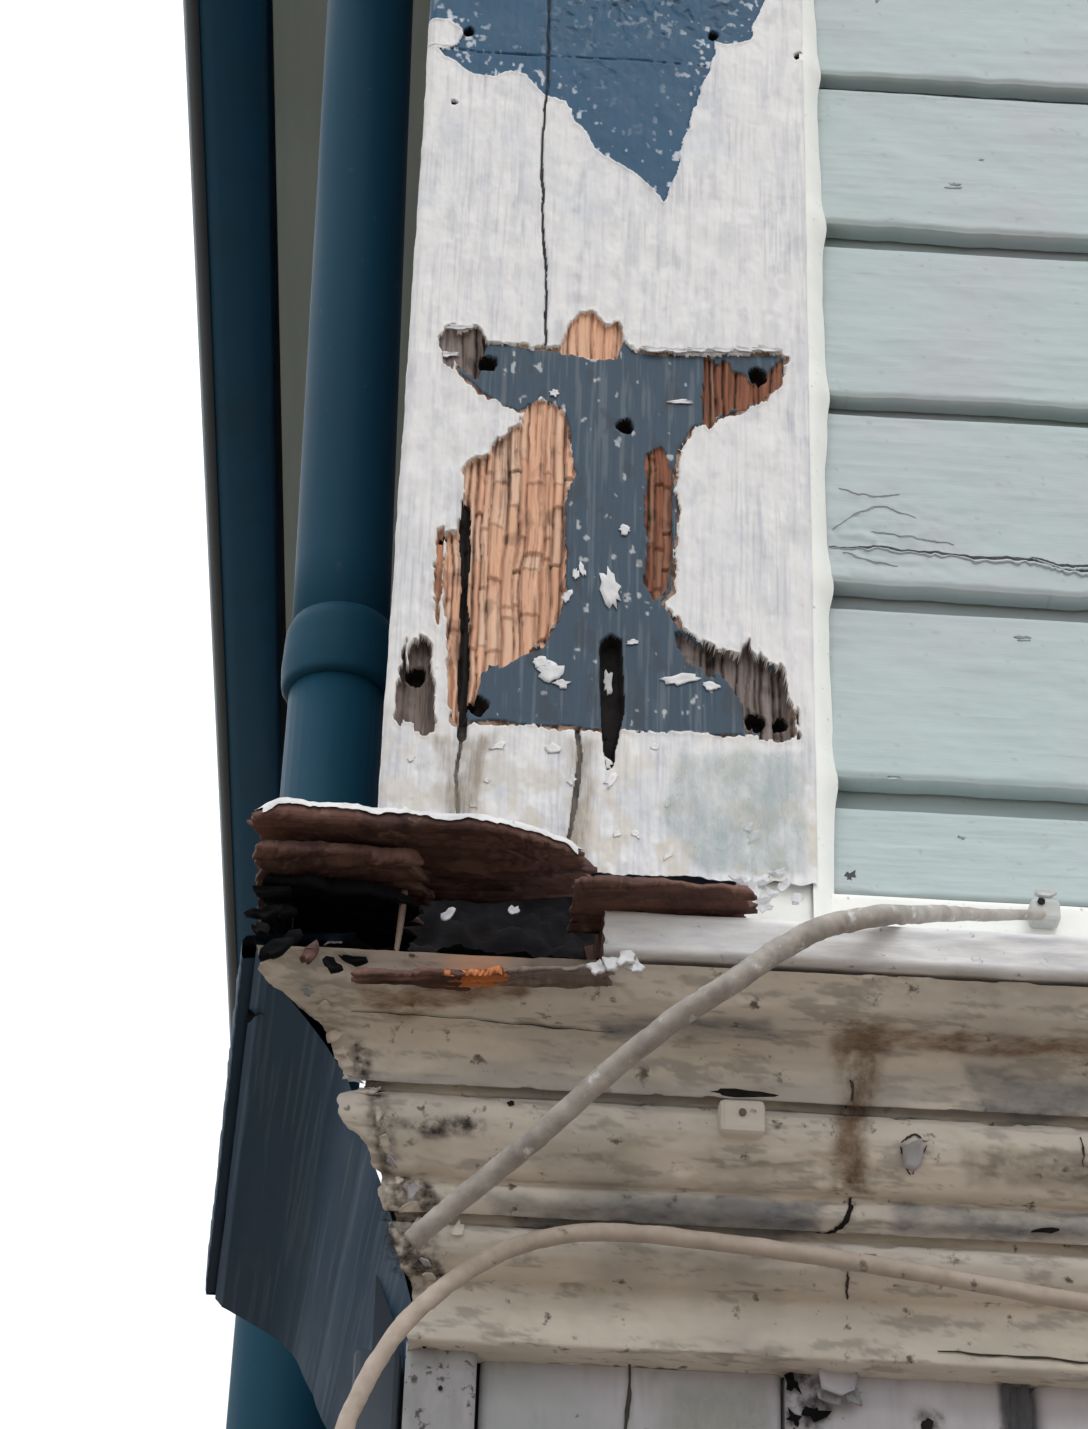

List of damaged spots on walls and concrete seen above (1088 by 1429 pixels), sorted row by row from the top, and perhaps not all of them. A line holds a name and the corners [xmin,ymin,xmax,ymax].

crack [517,0,551,346]
peeling [429,0,765,202]
peeling [394,311,800,790]
crack [829,488,1088,577]
peeling [441,907,456,922]
water stain [354,1044,444,1279]
water stain [420,1118,473,1137]
crack [938,1351,1088,1364]